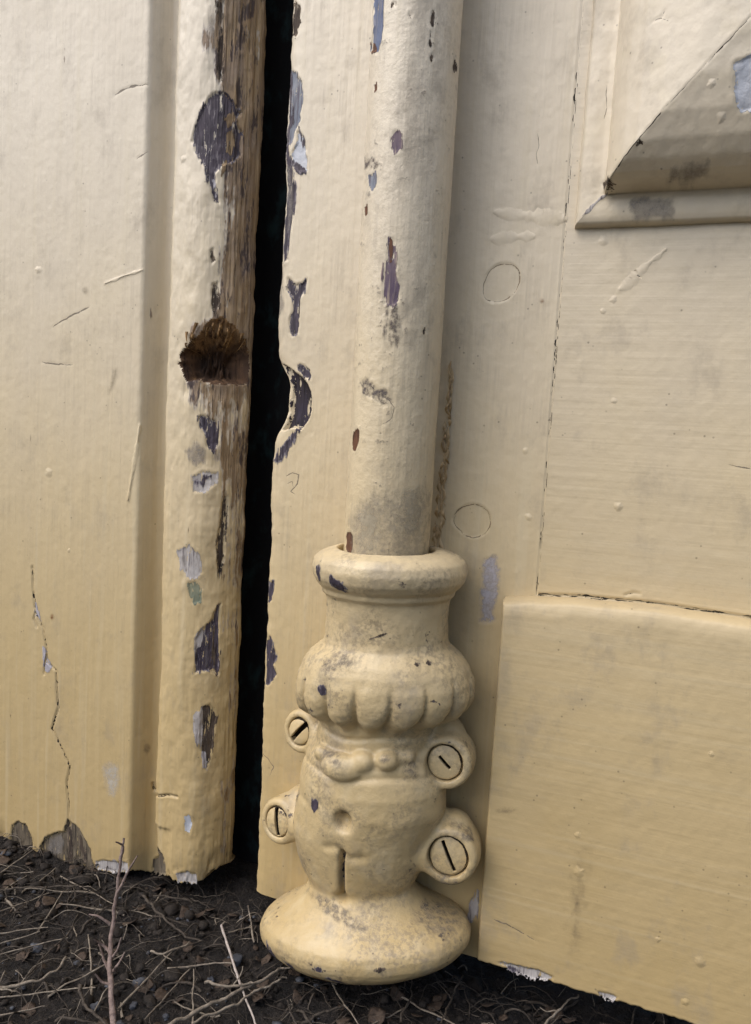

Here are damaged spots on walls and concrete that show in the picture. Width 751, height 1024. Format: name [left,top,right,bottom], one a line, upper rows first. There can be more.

peeling [733,54,751,113]
peeling [193,90,244,204]
peeling [282,69,307,264]
peeling [381,237,400,347]
peeling [297,364,311,380]
peeling [188,416,219,494]
peeling [274,427,303,464]
peeling [192,604,221,676]
crack [32,570,71,811]
peeling [193,705,218,770]
spalling [500,962,552,981]